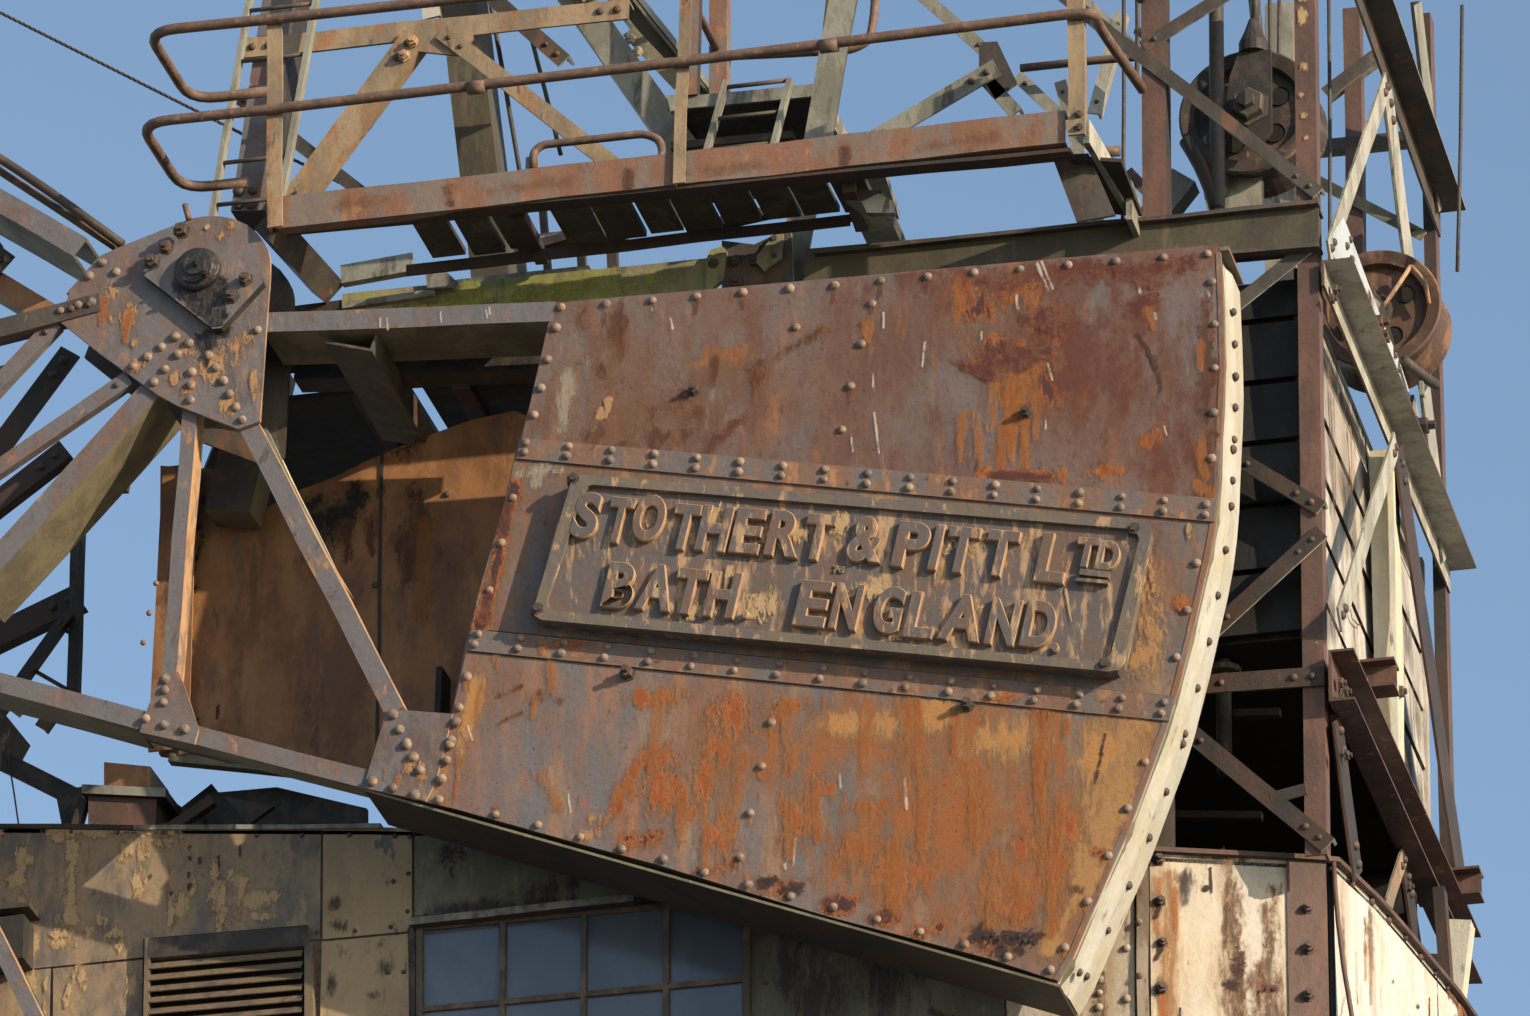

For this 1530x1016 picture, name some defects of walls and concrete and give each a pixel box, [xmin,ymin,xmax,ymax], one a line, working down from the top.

leakage [394,293,537,308]
rust [585,324,830,454]
rust [899,253,1219,498]
peeling [755,507,857,550]
peeling [743,586,778,624]
peeling [847,577,899,601]
rust [455,636,584,794]
rust [571,680,1149,957]
peeling [26,822,187,1016]
peeling [166,855,281,932]
leakage [1177,855,1245,905]
leakage [1364,909,1375,1004]